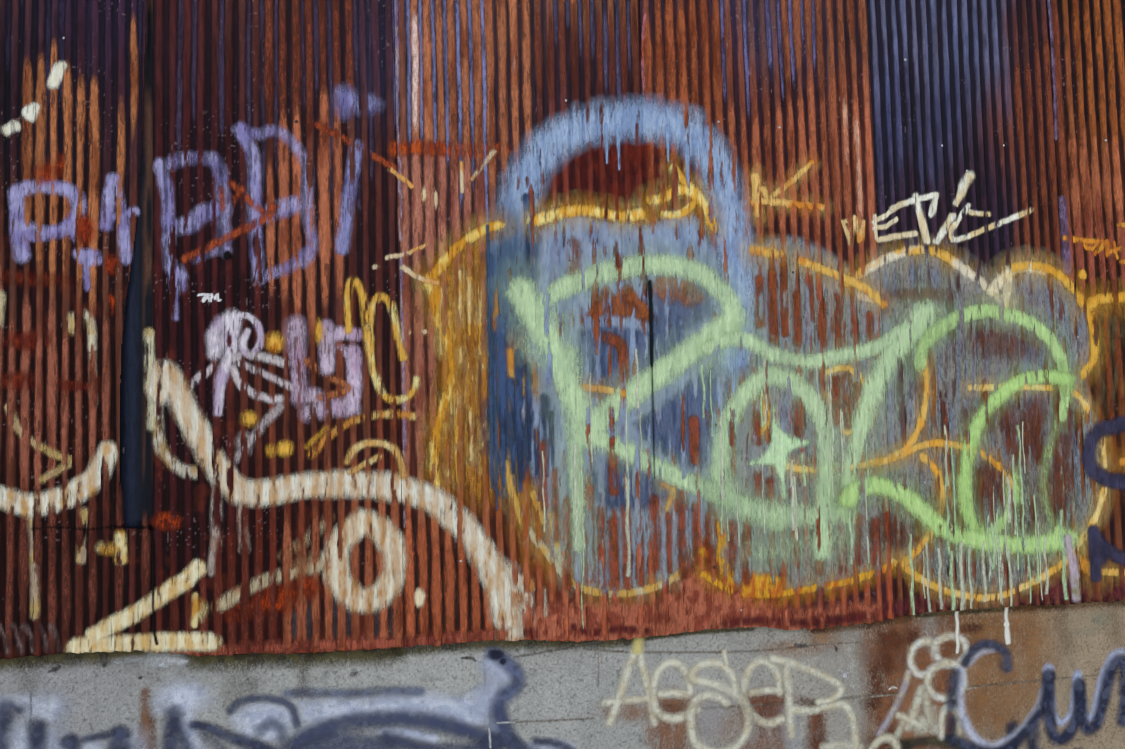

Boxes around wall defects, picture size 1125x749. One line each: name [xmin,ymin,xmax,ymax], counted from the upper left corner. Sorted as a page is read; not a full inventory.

rust [0,44,117,646]
rust [116,18,138,231]
rust [182,0,358,336]
rust [372,0,868,481]
rust [932,387,951,493]
rust [983,363,1012,478]
rust [1014,0,1125,291]
rust [1093,310,1124,437]
rust [115,489,123,615]
rust [141,512,181,600]
rust [170,498,1125,749]